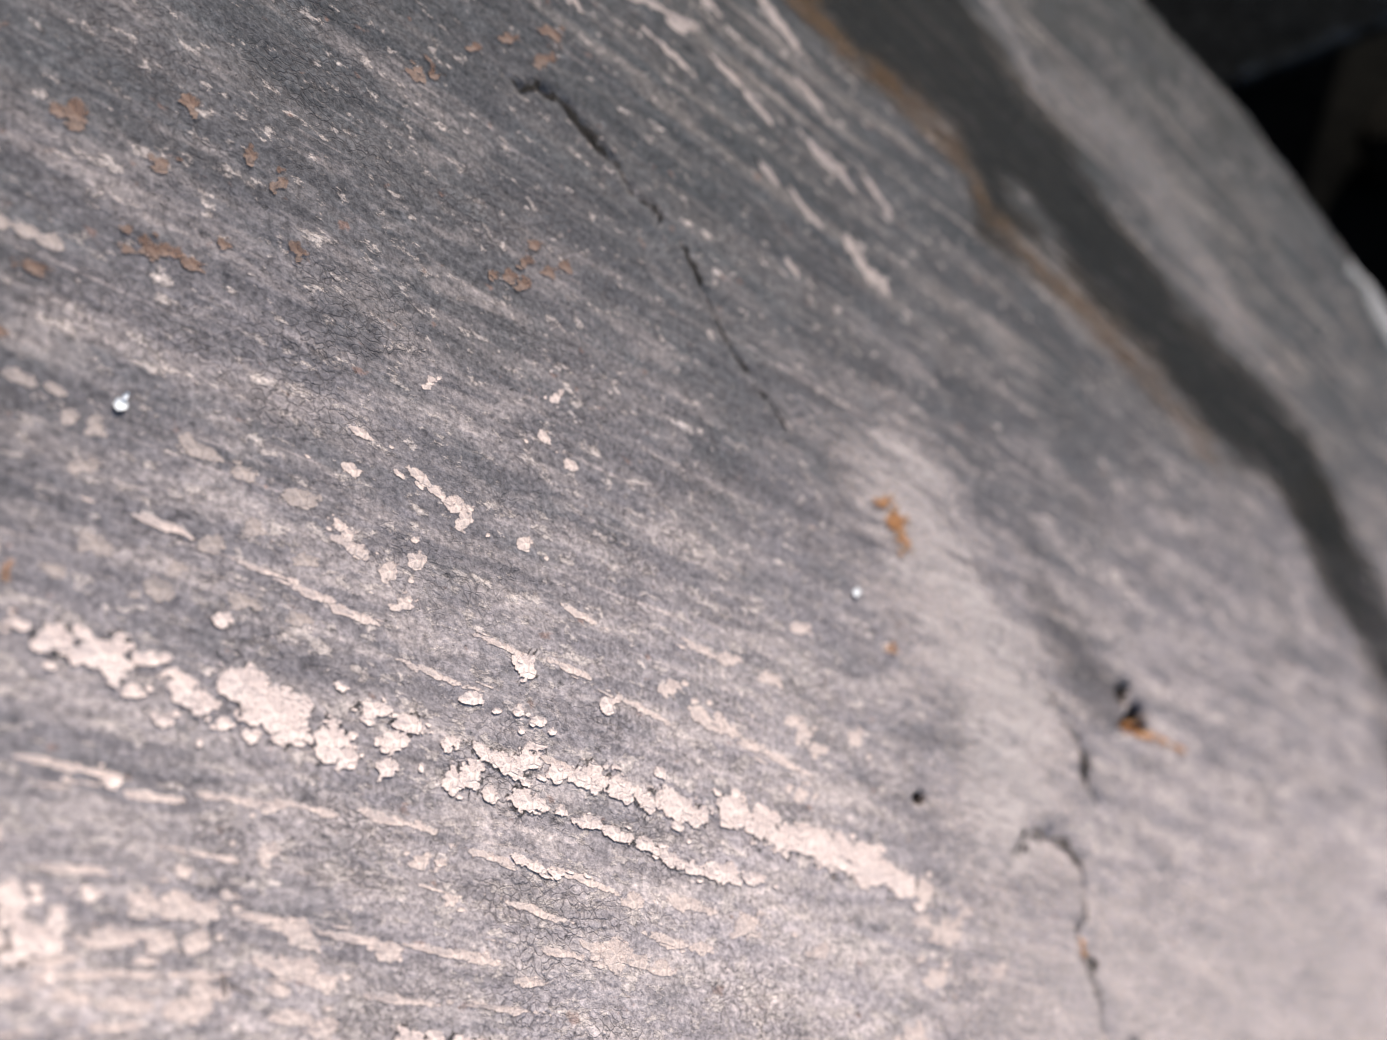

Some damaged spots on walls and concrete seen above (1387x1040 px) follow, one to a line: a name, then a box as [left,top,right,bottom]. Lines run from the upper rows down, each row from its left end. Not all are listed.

crack [507,76,787,429]
peeling [176,432,258,482]
peeling [128,488,427,629]
peeling [341,462,364,479]
peeling [393,465,475,533]
peeling [524,429,579,472]
corrosion [873,482,913,557]
peeling [0,608,975,991]
crack [1041,680,1097,804]
peeling [0,841,502,1040]
crack [1014,825,1106,1040]
peeling [362,992,551,1040]